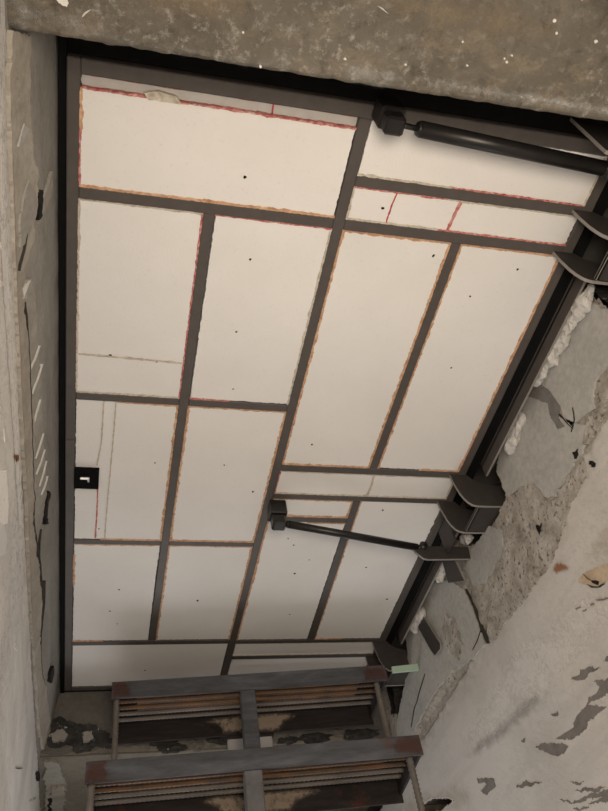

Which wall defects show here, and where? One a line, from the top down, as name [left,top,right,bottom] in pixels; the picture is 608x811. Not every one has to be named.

spalling [486,385,608,640]
peeling [536,656,608,756]
peeling [477,778,496,795]
peeling [560,781,608,811]